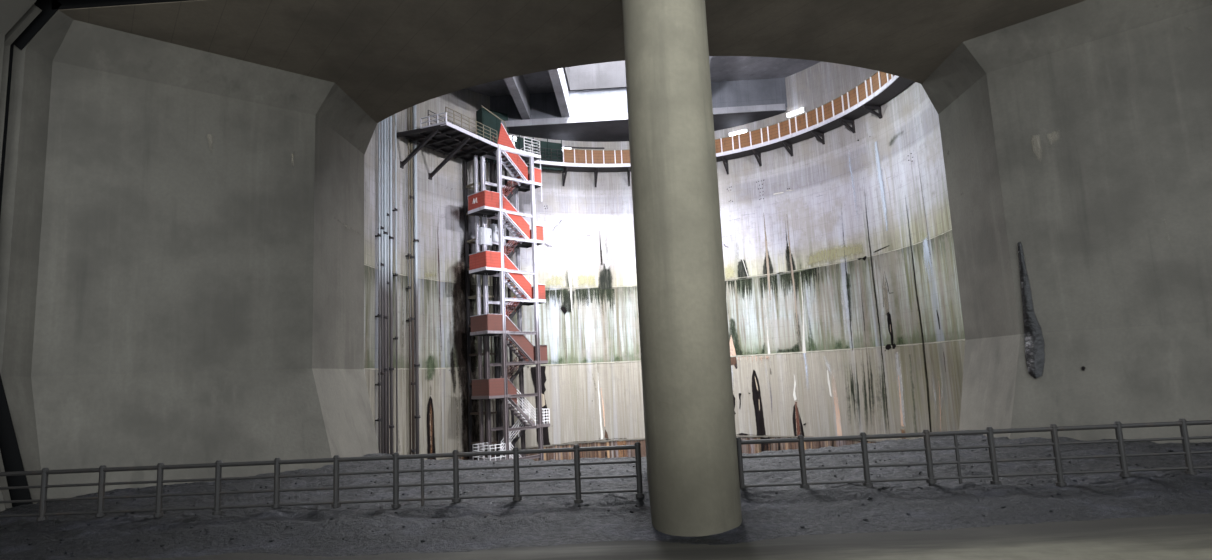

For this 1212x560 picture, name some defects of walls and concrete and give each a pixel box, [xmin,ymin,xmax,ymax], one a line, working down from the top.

damp [449,236,480,460]
damp [546,240,615,314]
damp [725,219,819,373]